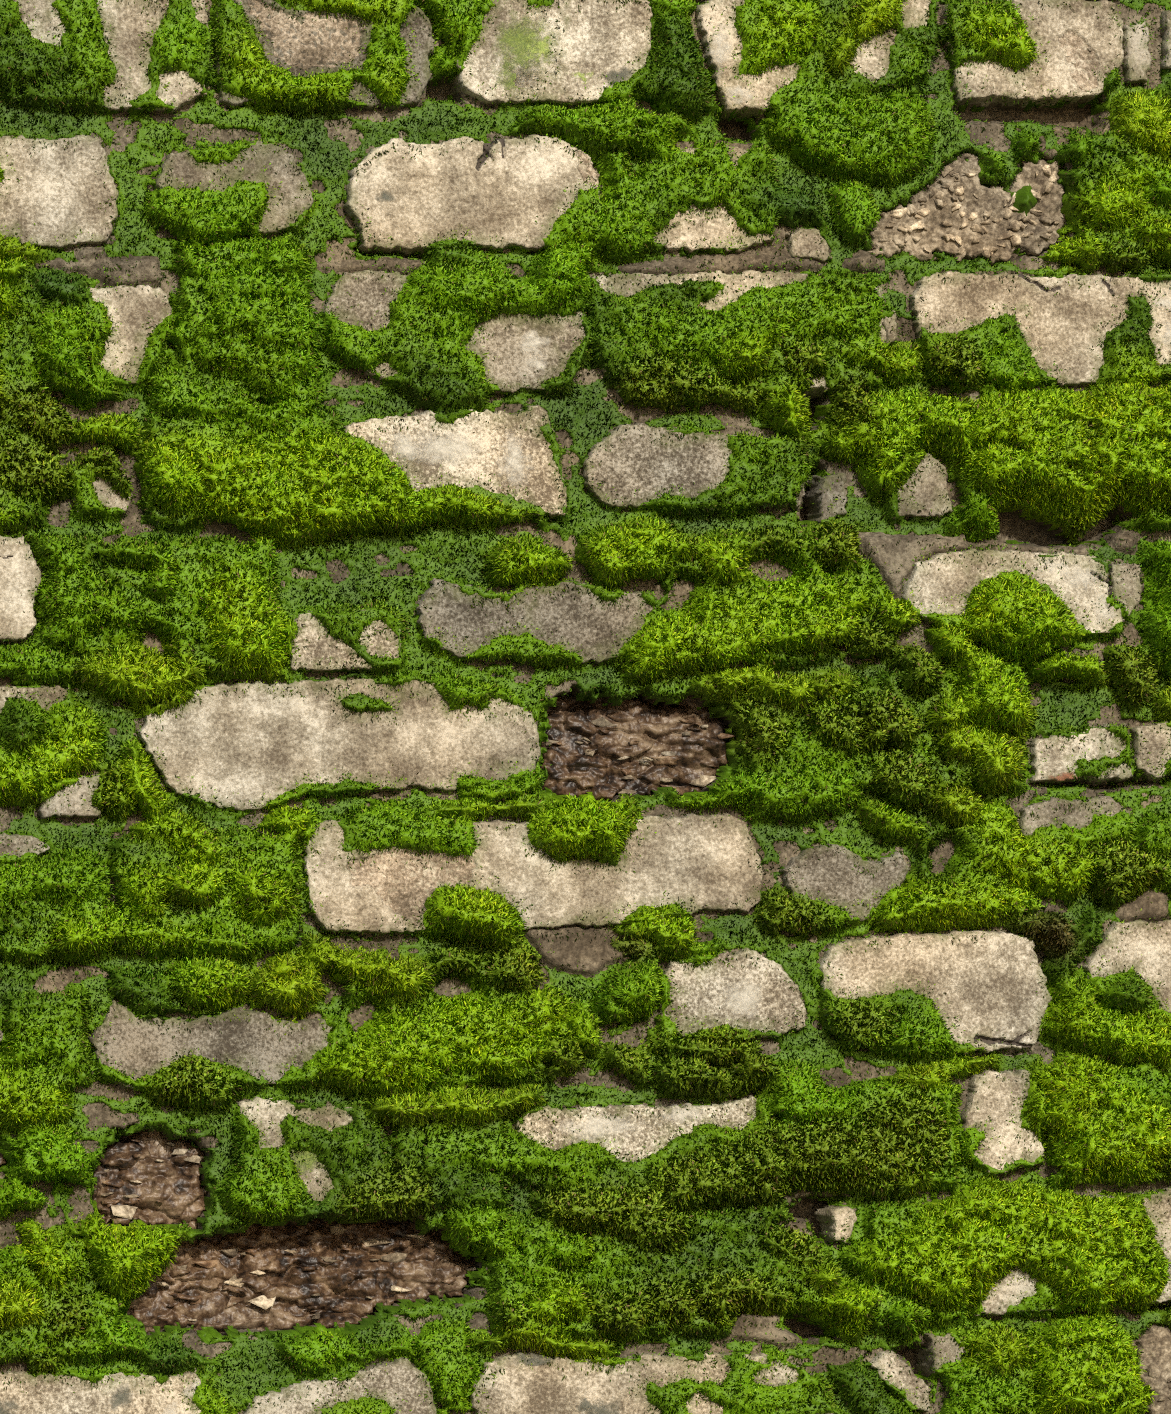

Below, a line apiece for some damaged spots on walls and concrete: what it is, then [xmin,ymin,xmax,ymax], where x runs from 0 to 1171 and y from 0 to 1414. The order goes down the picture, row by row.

crack [476,139,505,171]